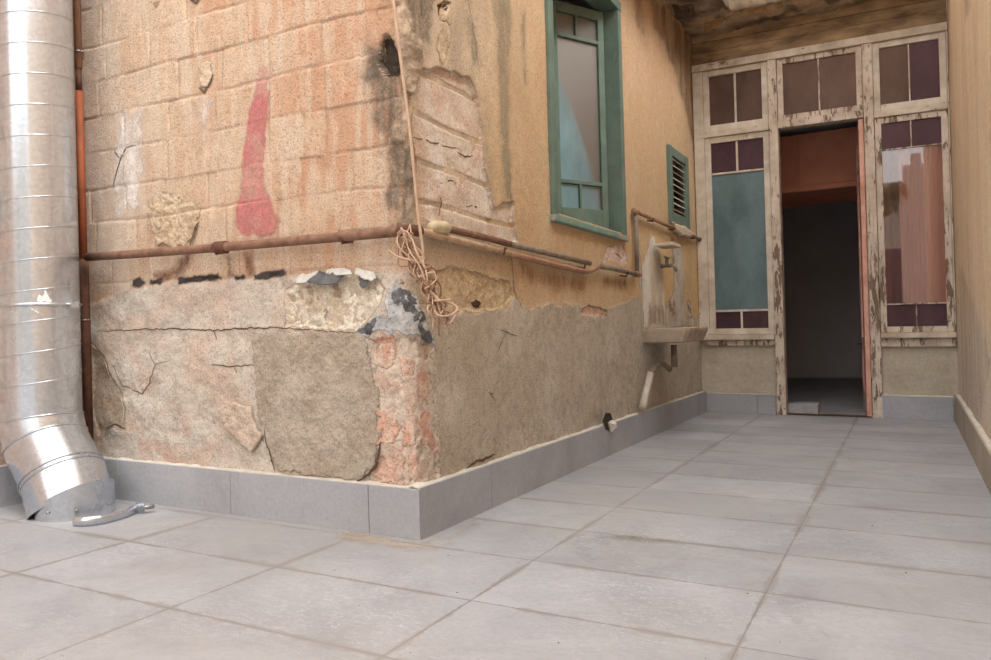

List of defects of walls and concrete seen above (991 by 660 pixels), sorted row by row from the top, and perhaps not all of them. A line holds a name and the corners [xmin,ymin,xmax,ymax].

leakage [409,0,432,41]
leakage [365,48,416,222]
spalling [378,1,517,244]
corrosion [156,254,190,280]
spalling [284,268,384,332]
spalling [423,258,522,313]
flaking render [218,401,264,453]
spalling [368,332,442,485]